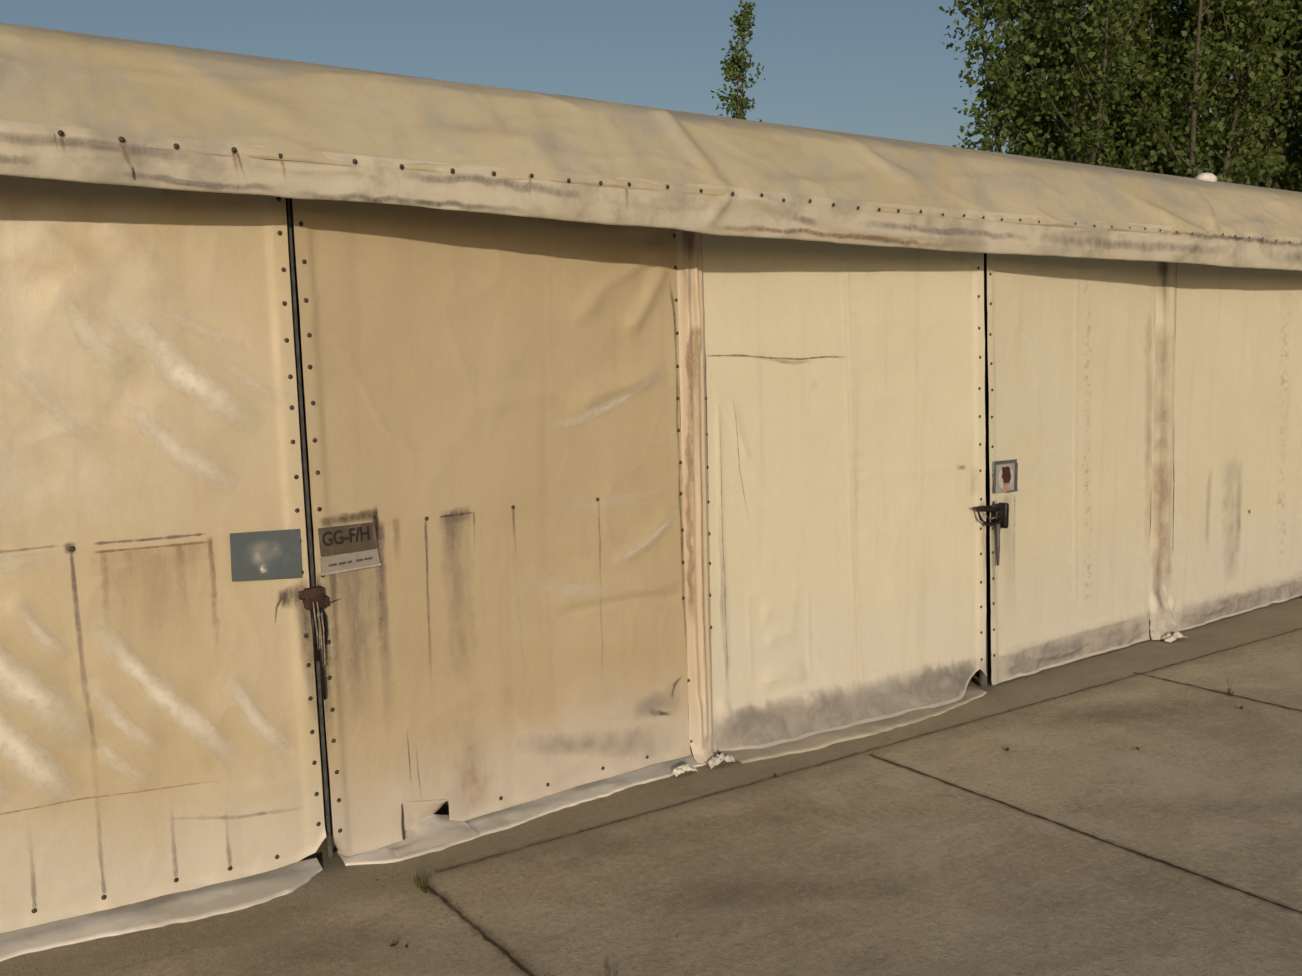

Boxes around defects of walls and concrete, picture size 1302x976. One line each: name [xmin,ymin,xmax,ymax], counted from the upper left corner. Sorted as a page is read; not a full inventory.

damp [97,533,212,553]
damp [373,513,384,600]